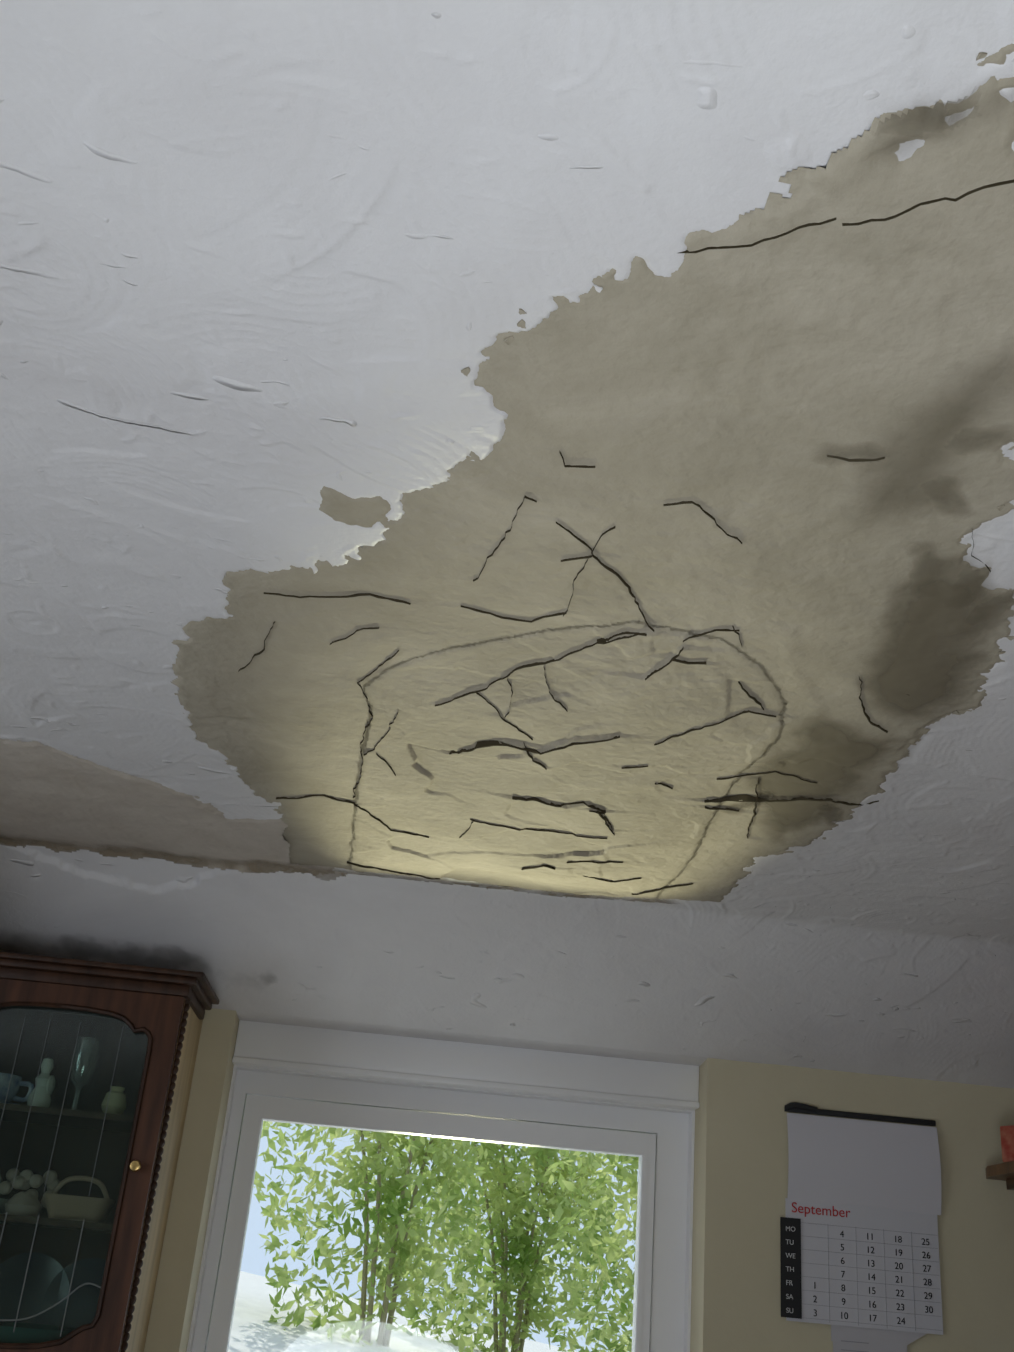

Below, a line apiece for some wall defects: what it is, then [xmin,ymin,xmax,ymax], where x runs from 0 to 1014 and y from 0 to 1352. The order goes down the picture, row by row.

crack [679,180,1014,253]
flaking render [0,44,1014,902]
crack [559,451,595,468]
leakage [873,566,989,714]
crack [238,496,776,895]
crack [859,677,888,733]
crack [704,771,879,838]
leakage [754,723,881,832]